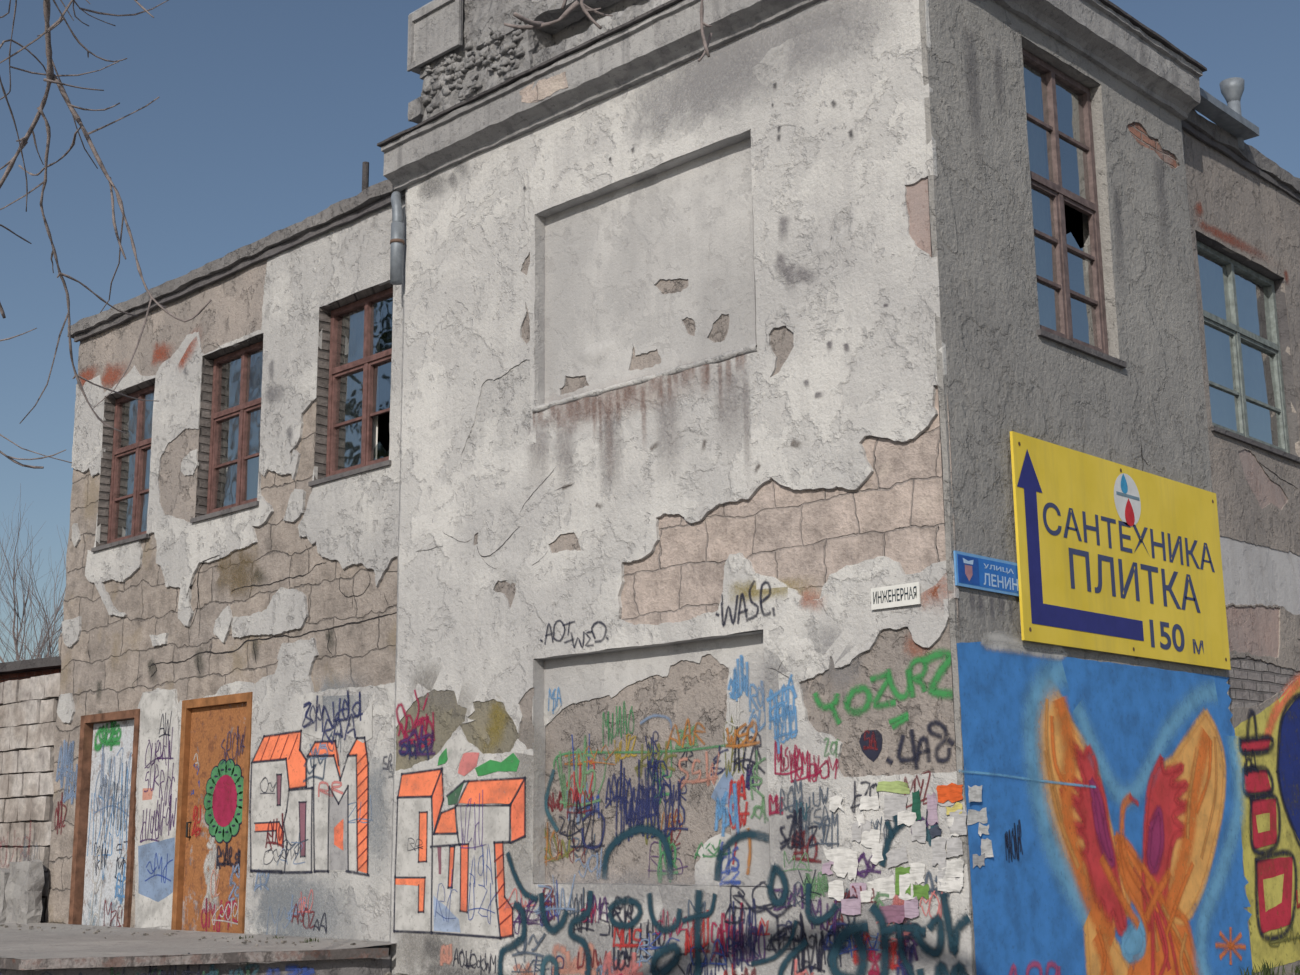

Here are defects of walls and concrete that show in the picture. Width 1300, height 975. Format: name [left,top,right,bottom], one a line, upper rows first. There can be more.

flaking render [1127,122,1179,169]
flaking render [906,178,936,257]
flaking render [77,259,268,392]
flaking render [655,279,689,294]
flaking render [683,314,730,343]
spalling [770,326,794,376]
flaking render [549,533,581,553]
flaking render [621,386,955,625]
flaking render [45,401,398,924]
flaking render [800,598,966,777]
peeling [1220,536,1300,708]
flaking render [395,654,731,886]